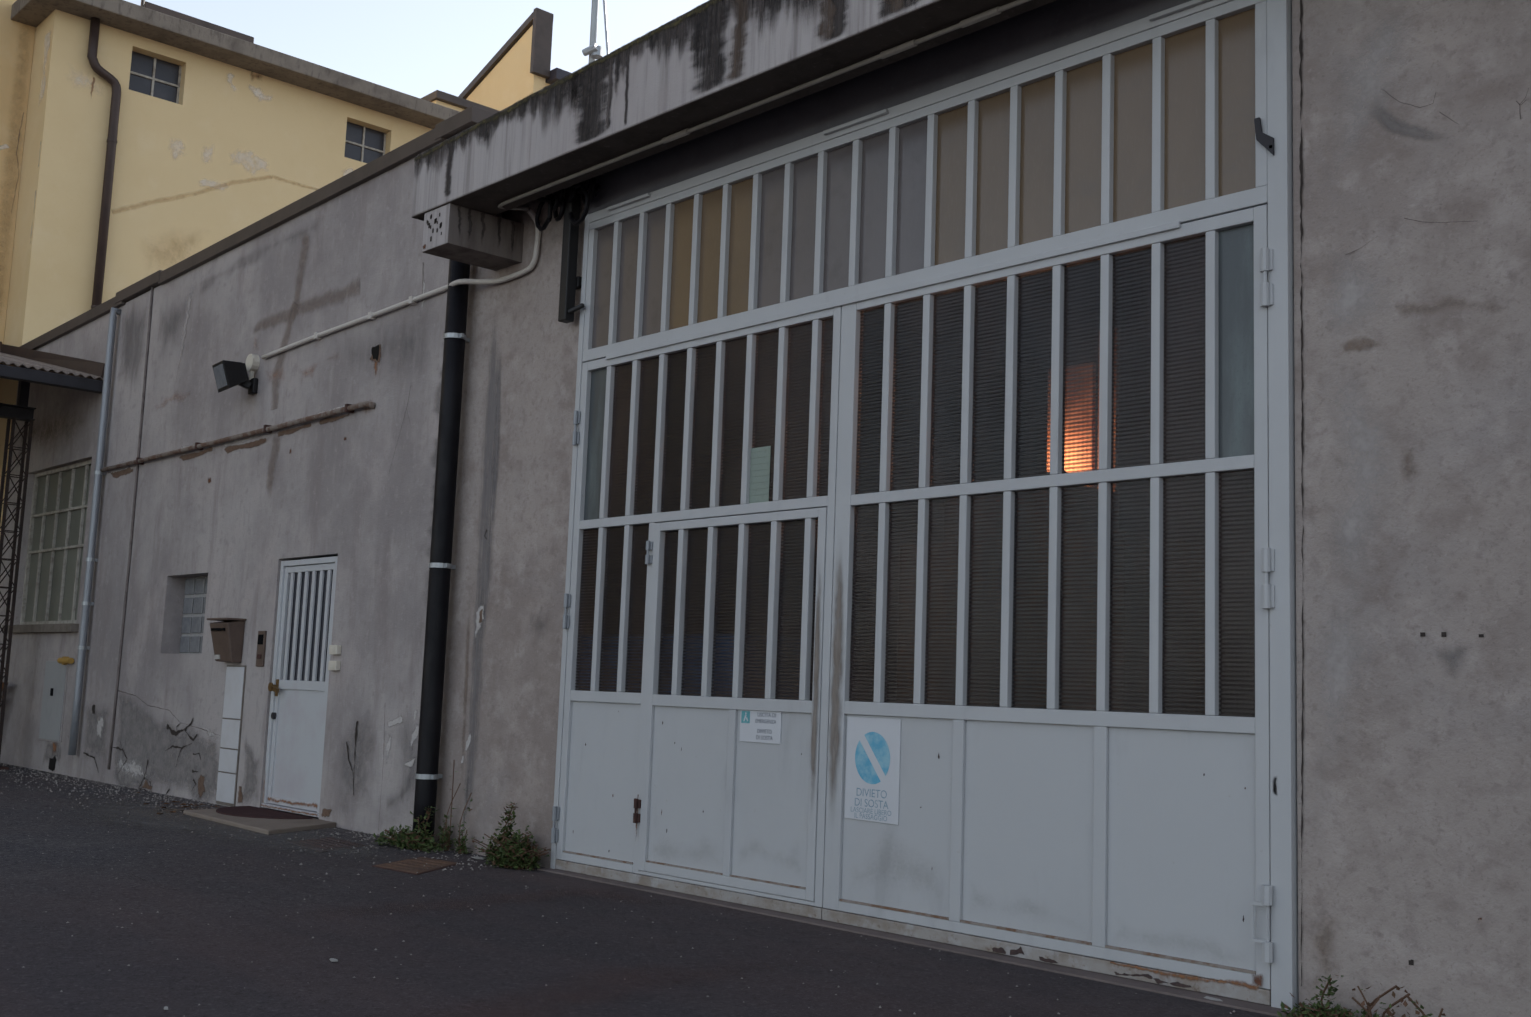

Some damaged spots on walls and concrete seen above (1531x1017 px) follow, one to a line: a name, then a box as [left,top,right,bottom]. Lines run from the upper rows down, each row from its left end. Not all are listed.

water stain [880,0,916,17]
water stain [414,0,846,250]
crack [68,691,217,794]
flaking render [87,699,217,801]
flaking render [238,749,257,803]